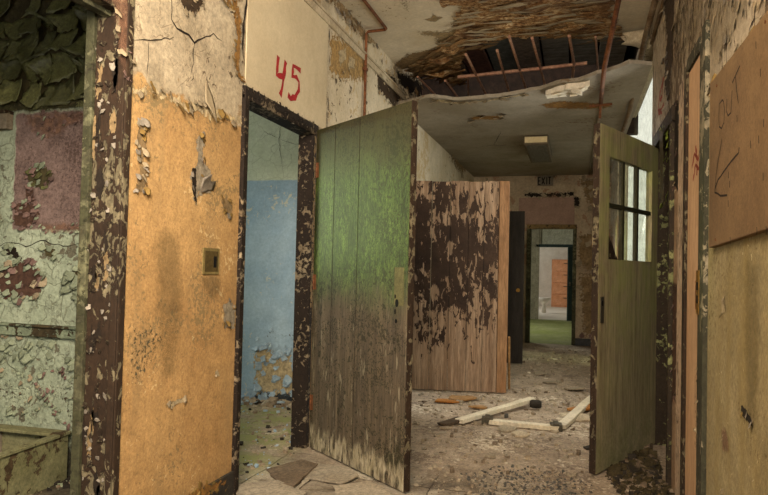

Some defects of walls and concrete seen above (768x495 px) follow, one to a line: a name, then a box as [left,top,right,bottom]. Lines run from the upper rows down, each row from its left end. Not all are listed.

crack [139,0,222,80]
crack [241,0,249,63]
spalling [327,0,651,107]
peeling [0,242,58,305]
peeling [58,265,78,305]
peeling [85,303,110,356]
peeling [251,327,294,397]
peeling [81,381,107,495]